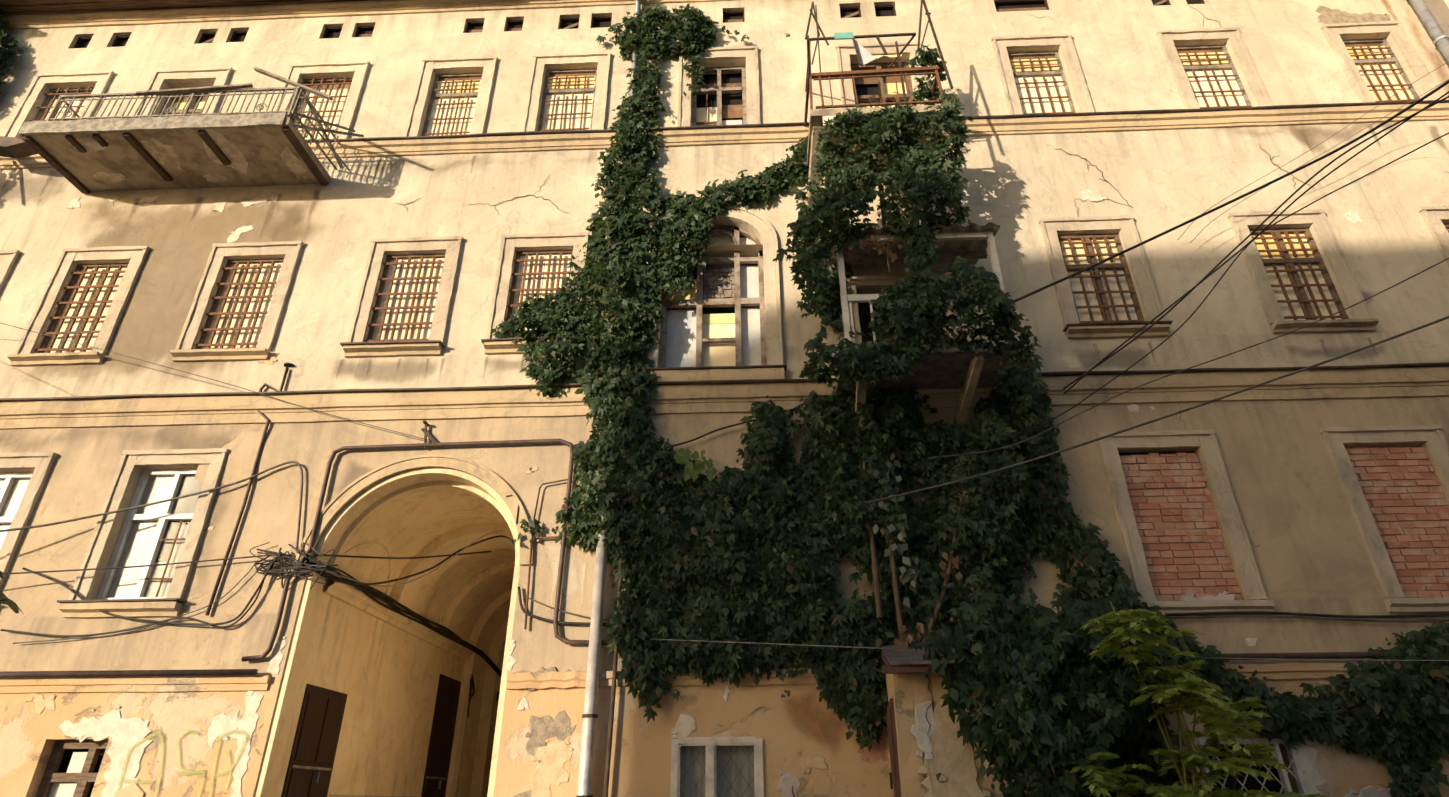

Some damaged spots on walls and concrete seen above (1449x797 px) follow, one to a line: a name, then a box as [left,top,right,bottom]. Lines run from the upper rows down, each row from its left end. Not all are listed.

crack [468,176,568,254]
crack [1050,145,1133,214]
peeling [25,693,154,797]
peeling [208,636,287,797]
peeling [505,640,587,797]
peeling [775,770,800,797]
flaking render [858,726,889,763]
peeling [911,700,991,797]
peeling [1291,740,1327,795]
flaking render [1344,785,1411,797]